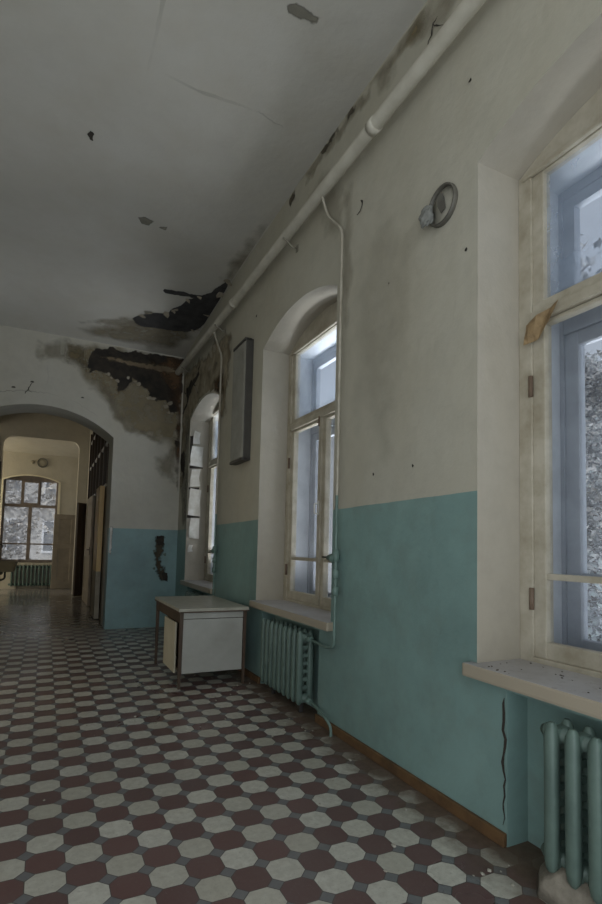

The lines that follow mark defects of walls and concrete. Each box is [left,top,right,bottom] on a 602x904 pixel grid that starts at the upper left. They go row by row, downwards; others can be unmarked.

peeling [133,279,232,332]
flaking render [88,335,232,552]